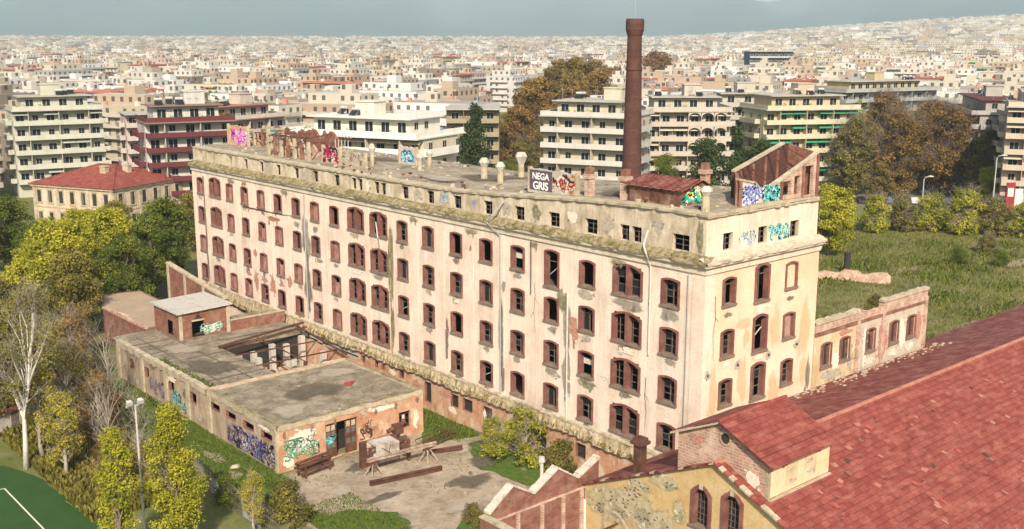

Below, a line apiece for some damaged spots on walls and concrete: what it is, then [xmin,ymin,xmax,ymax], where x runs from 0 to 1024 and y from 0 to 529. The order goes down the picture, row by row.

water stain [483,272,521,377]
water stain [546,298,571,403]
peeling [568,316,591,348]
peeling [821,311,924,381]
water stain [274,369,354,418]
peeling [586,472,685,529]